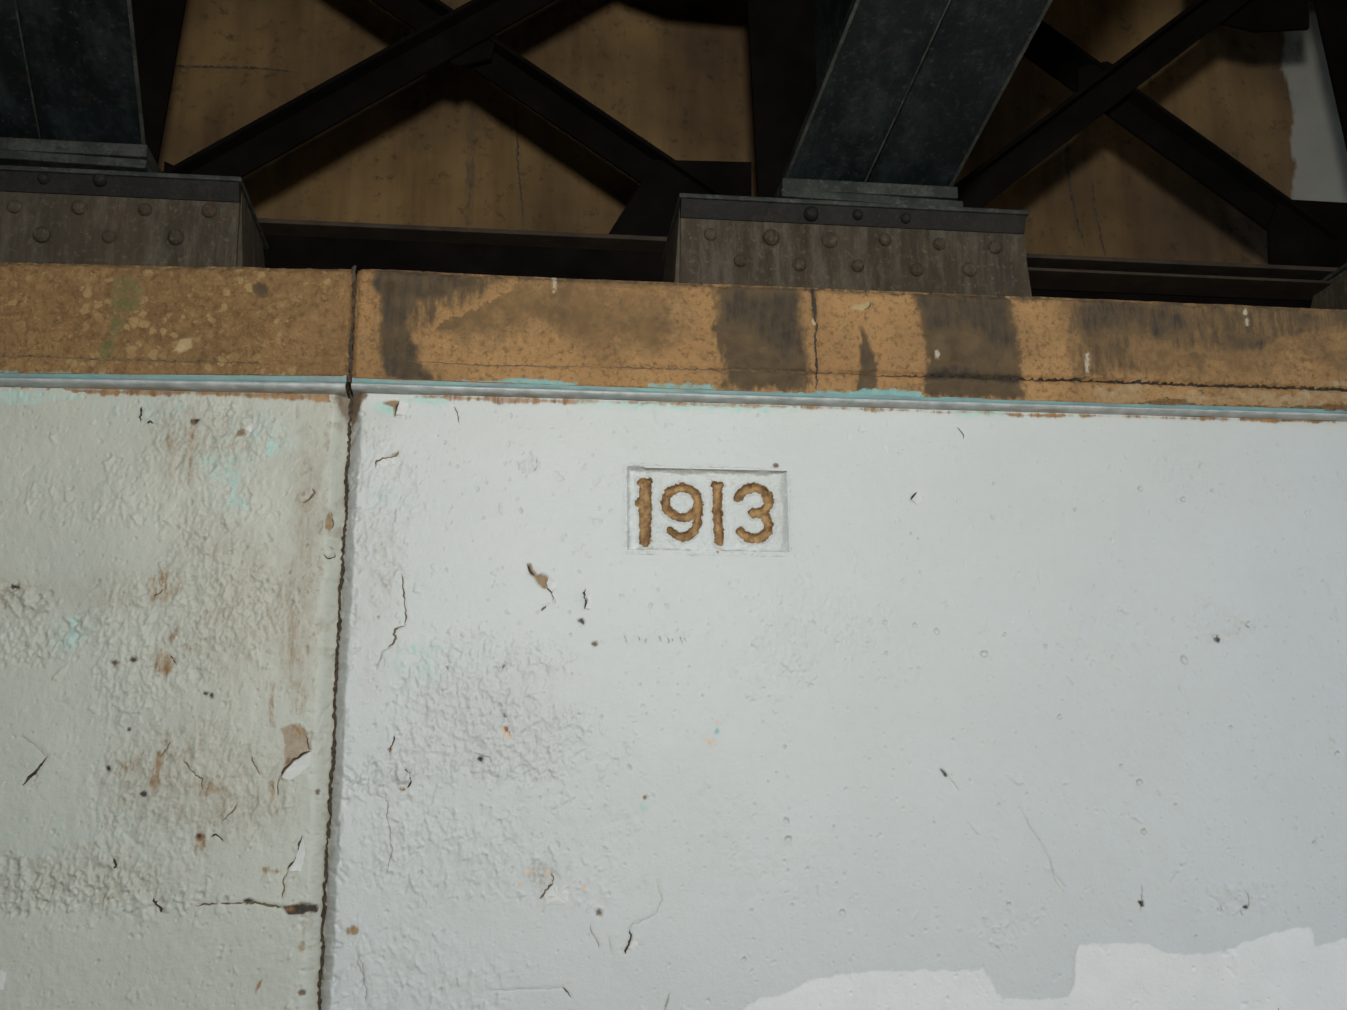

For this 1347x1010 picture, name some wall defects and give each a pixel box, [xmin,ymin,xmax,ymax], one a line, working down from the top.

damp [368,269,811,406]
damp [904,292,1025,387]
damp [329,393,370,430]
damp [742,404,924,415]
crack [195,837,305,908]